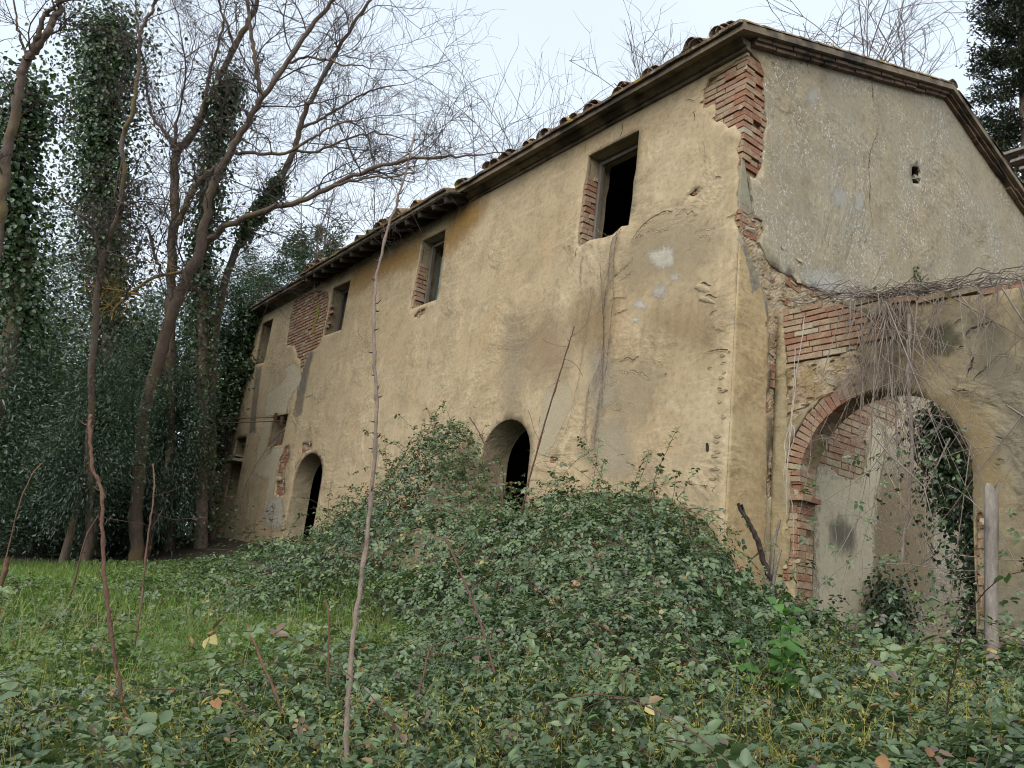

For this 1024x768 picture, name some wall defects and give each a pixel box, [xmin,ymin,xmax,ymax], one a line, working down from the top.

spalling [700,56,767,175]
crack [867,80,879,227]
crack [609,208,735,315]
spalling [774,296,906,364]
spalling [254,291,335,528]
damp [832,521,854,549]